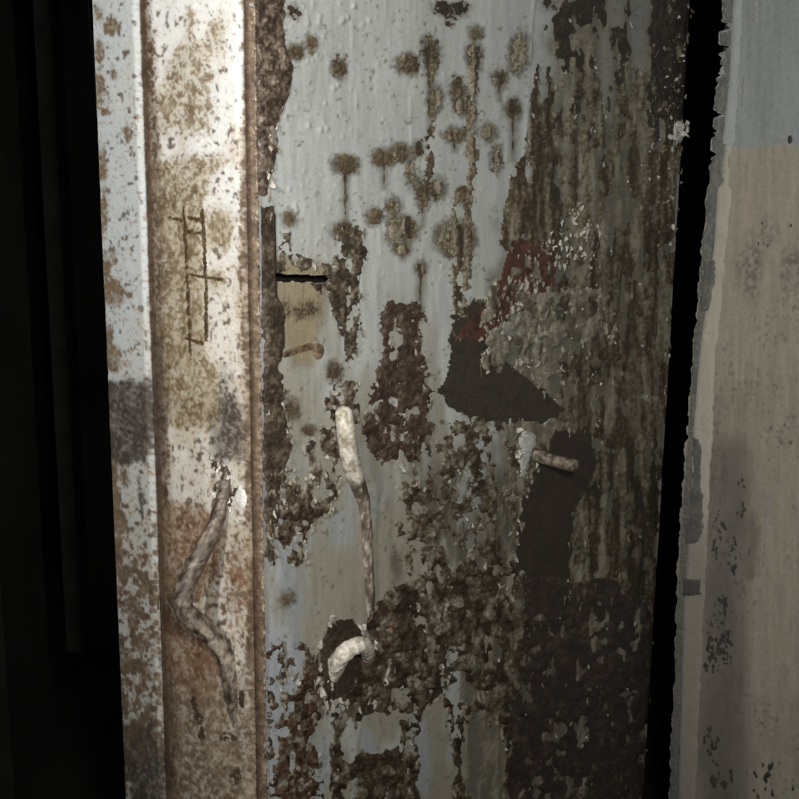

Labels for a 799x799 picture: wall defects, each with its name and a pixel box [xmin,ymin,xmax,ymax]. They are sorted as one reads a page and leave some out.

corrosion [95,7,121,116]
peeling [268,126,278,152]
corrosion [99,153,108,180]
peeling [267,171,277,203]
spalling [437,239,624,622]